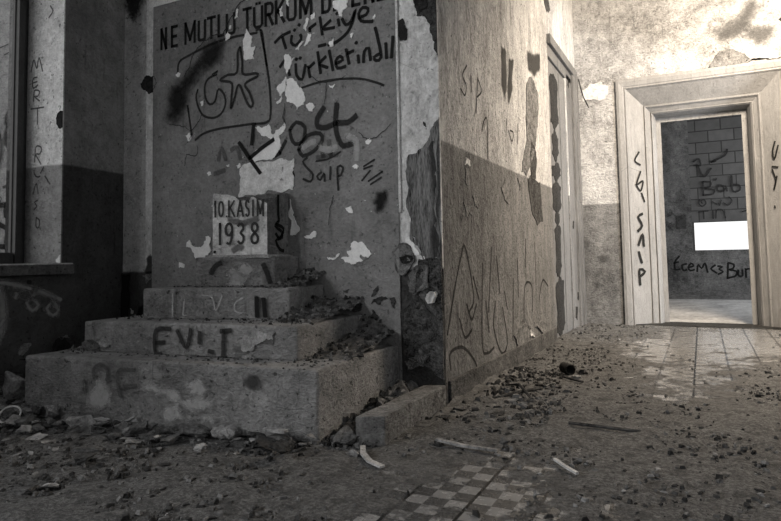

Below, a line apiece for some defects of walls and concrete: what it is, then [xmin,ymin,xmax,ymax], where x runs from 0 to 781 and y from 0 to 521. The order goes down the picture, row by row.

peeling [276,12,315,112]
flaking render [398,18,408,41]
flaking render [413,0,438,55]
flaking render [501,77,543,225]
peeling [186,236,212,258]
peeling [327,241,372,267]
flaking render [343,119,445,380]
peeling [549,73,569,336]